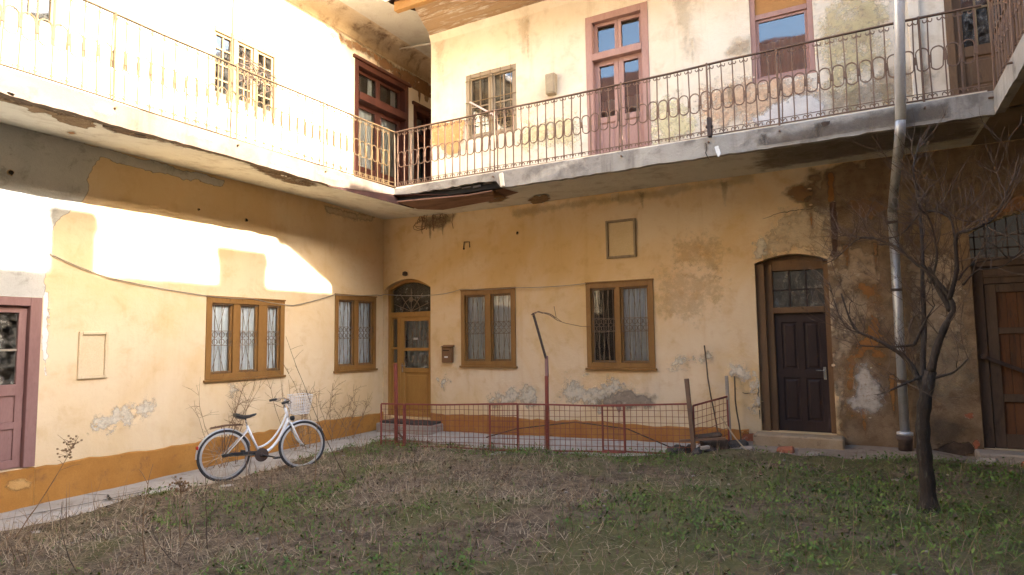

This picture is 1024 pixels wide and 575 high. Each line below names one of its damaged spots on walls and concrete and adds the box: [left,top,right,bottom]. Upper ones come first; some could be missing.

flaking render [0,92,73,126]
flaking render [0,123,224,298]
damp [786,184,815,202]
flaking render [804,139,1024,467]